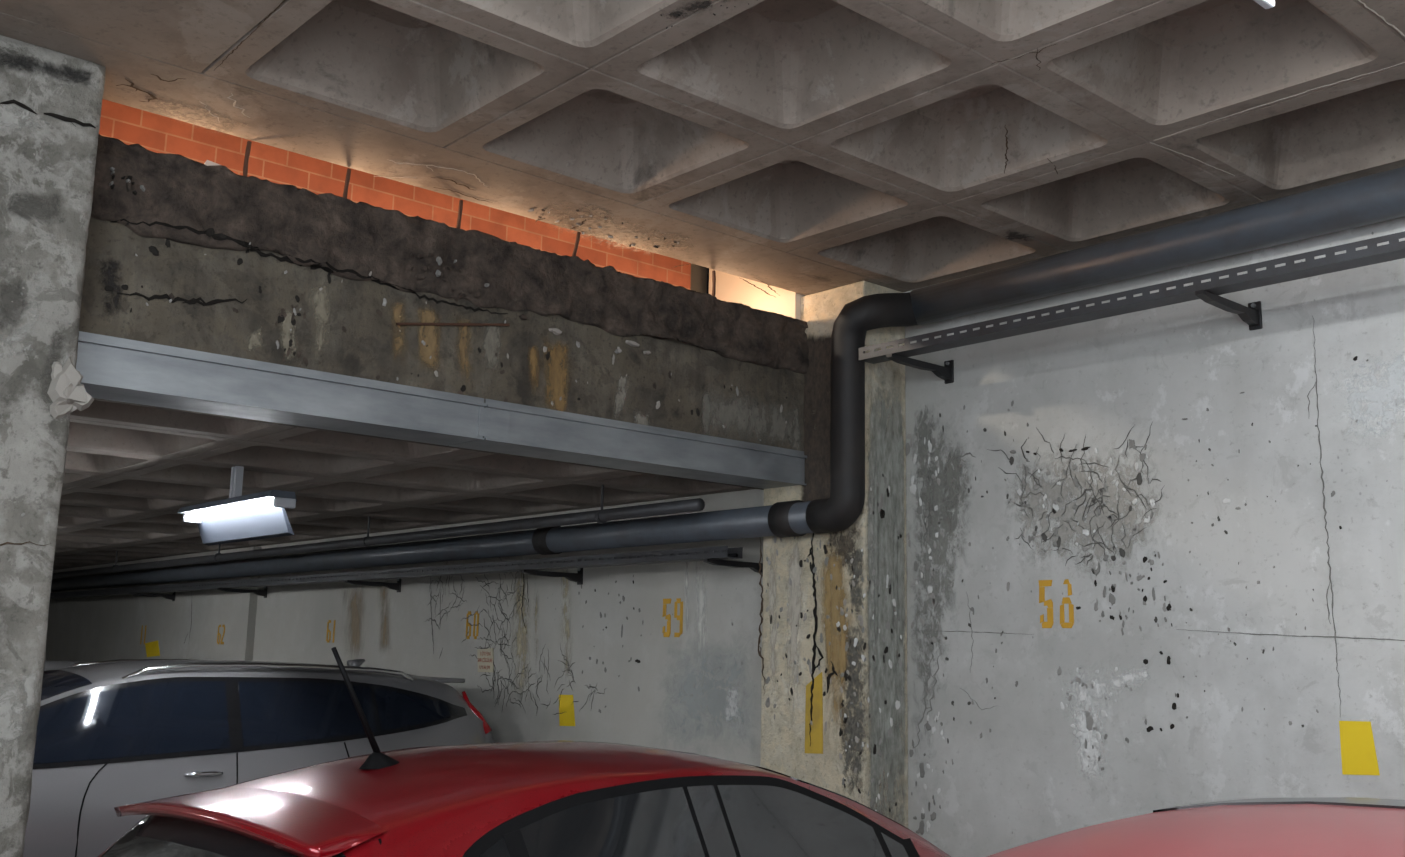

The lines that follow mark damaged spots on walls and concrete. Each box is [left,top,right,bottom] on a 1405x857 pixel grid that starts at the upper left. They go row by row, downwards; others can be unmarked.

crack [0,99,96,128]
crack [116,0,285,121]
crack [111,219,508,314]
rust [393,304,439,368]
rust [529,344,568,412]
crack [944,424,1165,566]
crack [425,557,605,715]
crack [807,533,838,746]
damp [829,393,968,823]